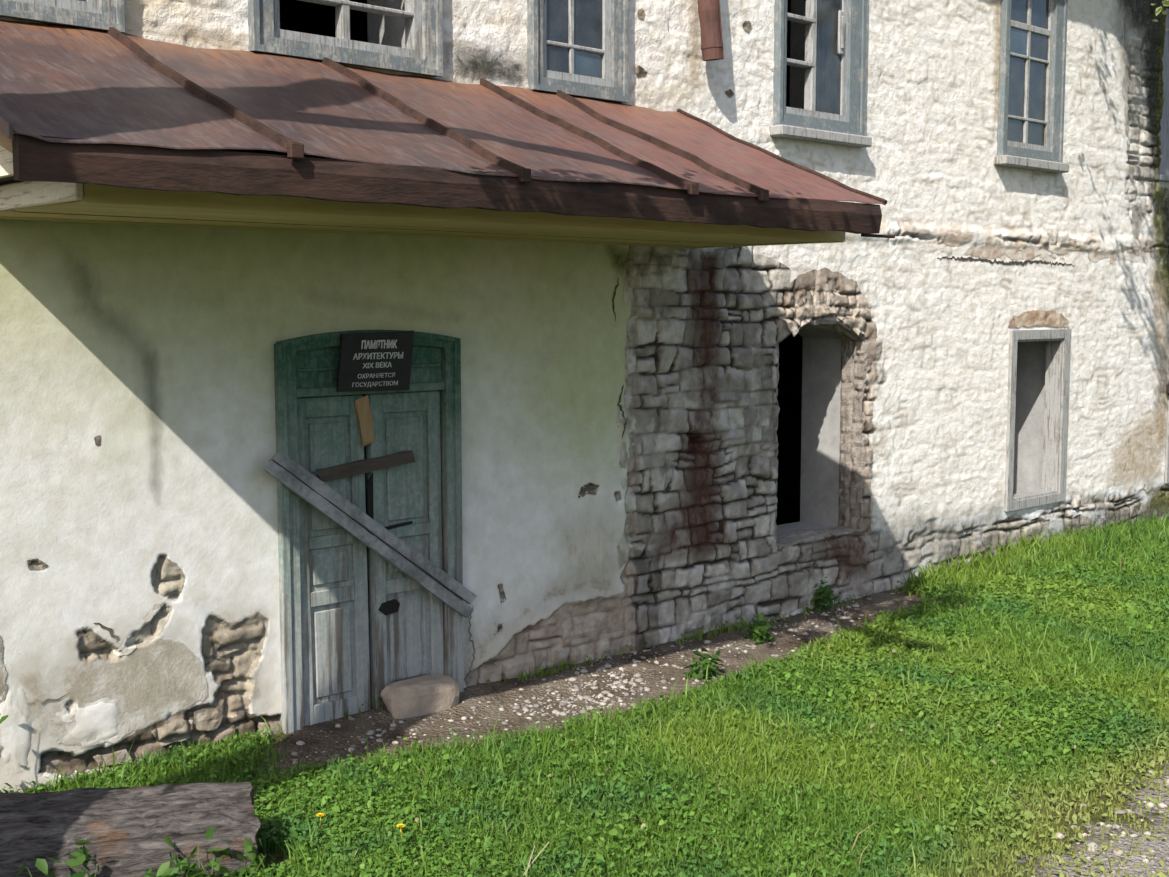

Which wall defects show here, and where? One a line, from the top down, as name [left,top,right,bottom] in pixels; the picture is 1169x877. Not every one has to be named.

leakage [1119,0,1166,170]
crack [937,256,1076,267]
spalling [27,558,48,570]
peeling [39,556,282,776]
spalling [464,260,661,687]
rust [668,255,730,550]